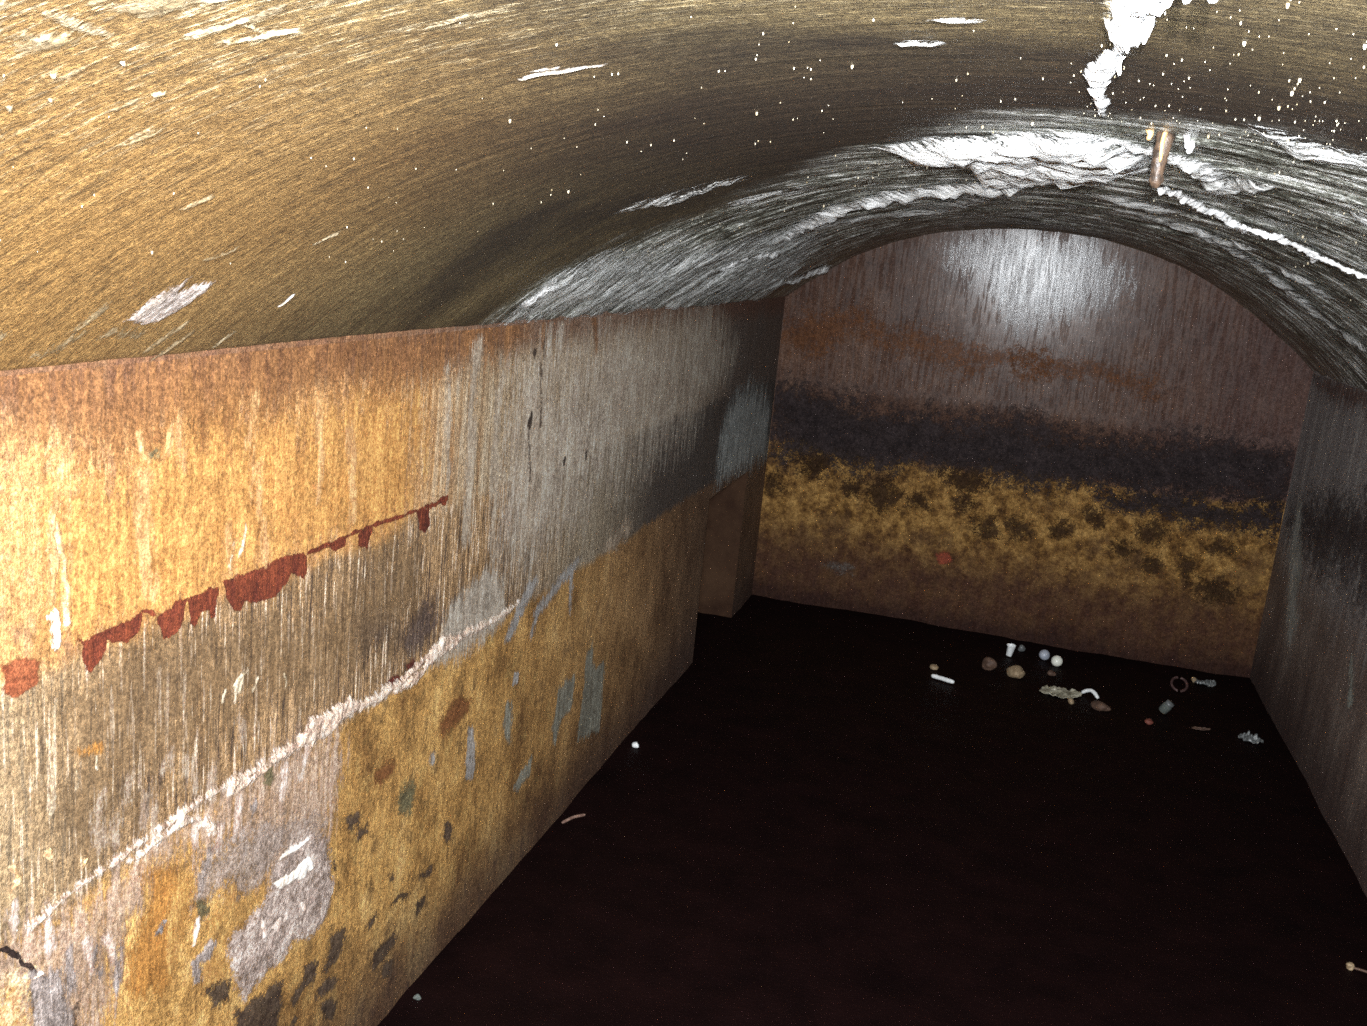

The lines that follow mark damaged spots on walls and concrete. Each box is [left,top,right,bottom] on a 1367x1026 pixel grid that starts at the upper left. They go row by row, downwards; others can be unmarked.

leakage [1083,0,1218,116]
leakage [0,125,1367,664]
rust [0,385,448,698]
leakage [503,672,519,743]
leakage [551,642,605,745]
leakage [398,779,416,817]
leakage [443,820,453,843]
leakage [513,755,532,793]
leakage [0,711,368,1026]
leakage [365,865,432,932]
crack [0,946,45,980]
leakage [369,932,397,978]